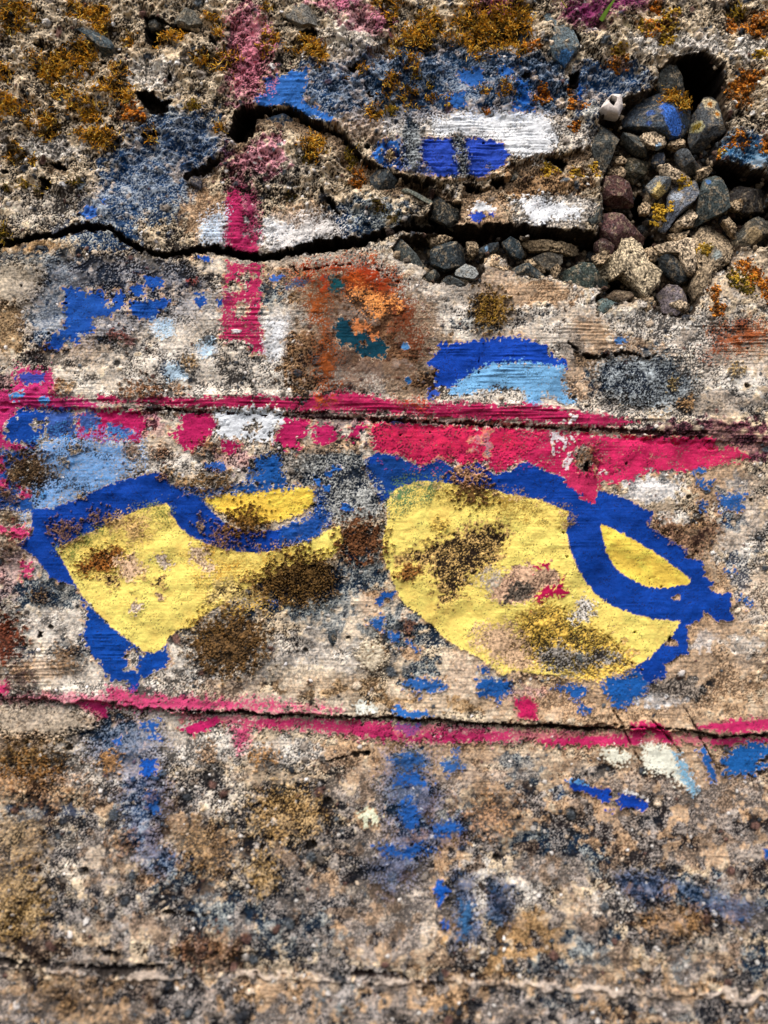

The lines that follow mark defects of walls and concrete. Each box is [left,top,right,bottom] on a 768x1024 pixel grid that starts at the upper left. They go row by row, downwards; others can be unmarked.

peeling [443,90,468,111]
peeling [497,64,530,80]
crack [0,105,594,283]
hole [464,177,505,194]
spalling [530,52,768,318]
spalling [393,201,539,285]
crack [167,706,767,768]